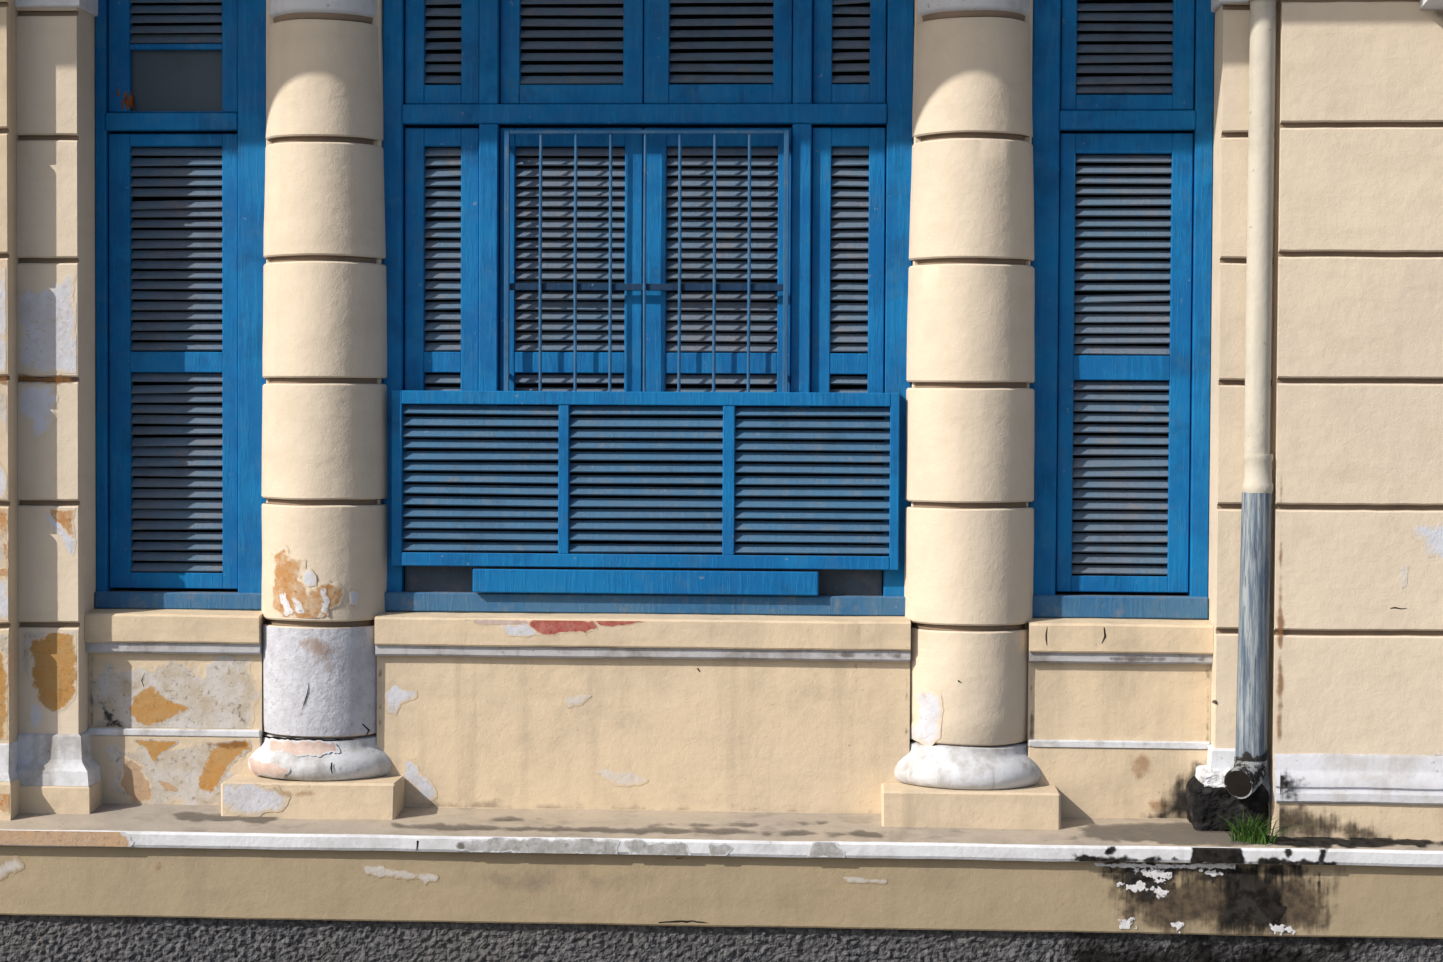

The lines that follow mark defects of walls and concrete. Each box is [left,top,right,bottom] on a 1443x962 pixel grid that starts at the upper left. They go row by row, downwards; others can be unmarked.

peeling [0,463,418,817]
flaking render [467,620,645,637]
peeling [0,788,134,847]